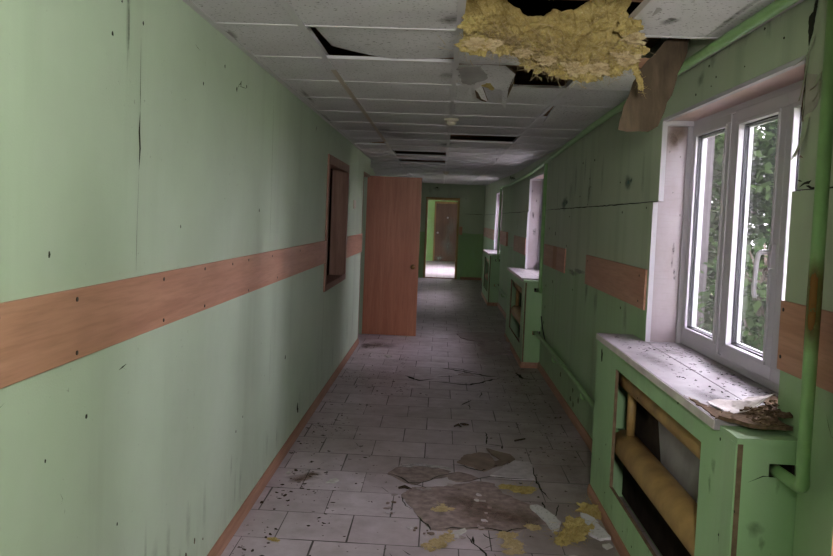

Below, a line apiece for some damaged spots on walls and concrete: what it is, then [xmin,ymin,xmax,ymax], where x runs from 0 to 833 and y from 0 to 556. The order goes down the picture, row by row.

peeling [790,117,810,160]
crack [407,368,538,408]
spalling [383,466,546,539]
crack [374,424,559,556]